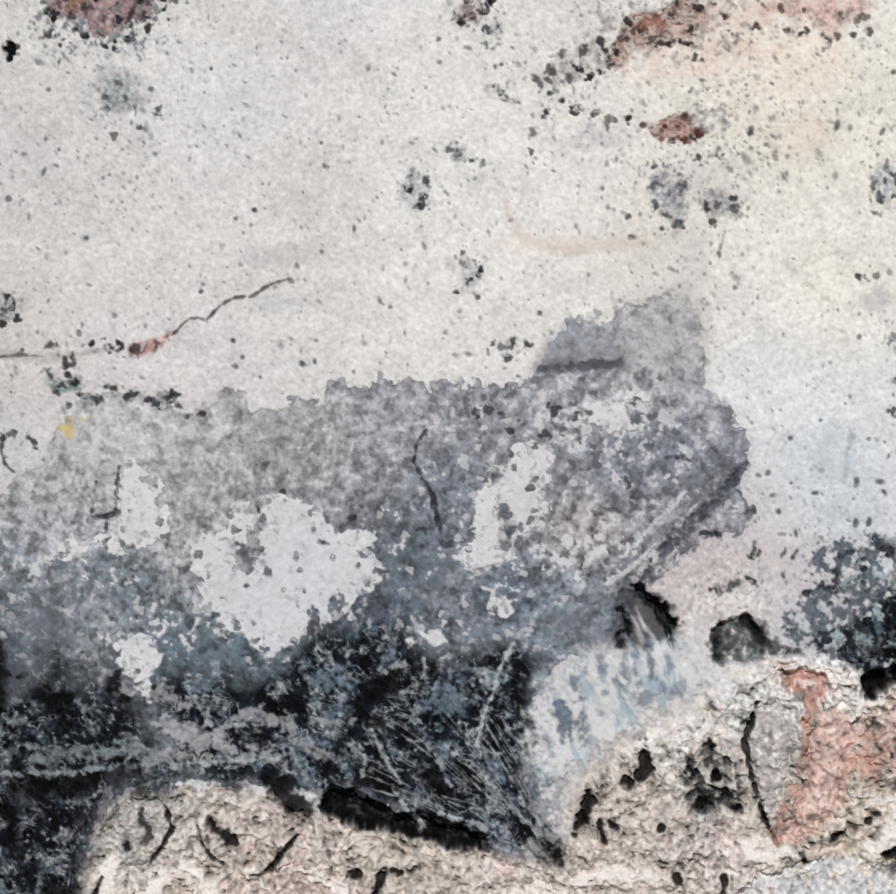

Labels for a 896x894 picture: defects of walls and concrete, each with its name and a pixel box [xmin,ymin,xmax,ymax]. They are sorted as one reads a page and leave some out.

crack [172,280,285,335]
peeling [0,293,756,814]
damp [709,576,756,595]
damp [781,534,896,674]
spalling [860,665,896,700]
damp [0,580,702,894]
crack [741,701,775,838]
spalling [282,754,492,852]
peeling [55,864,68,876]
crack [93,876,104,894]
crack [150,808,225,865]
crack [250,834,299,876]